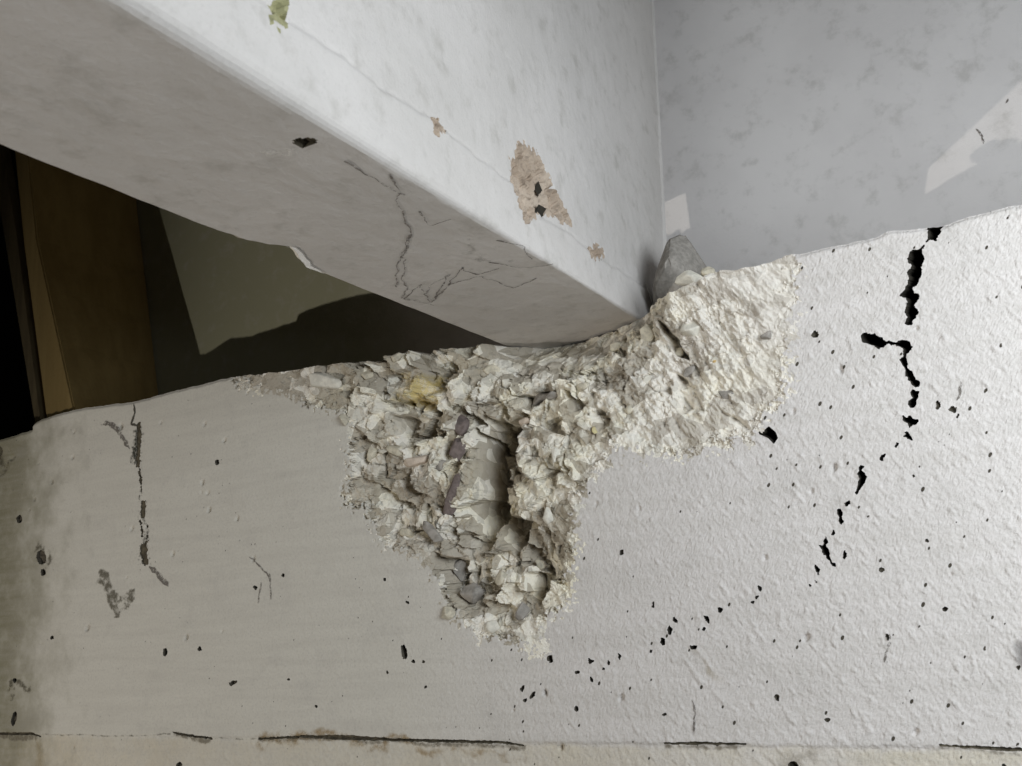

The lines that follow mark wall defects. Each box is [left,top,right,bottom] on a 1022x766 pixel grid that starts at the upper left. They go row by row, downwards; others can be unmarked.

spalling [290,246,324,273]
crack [344,161,552,305]
spalling [508,140,572,227]
crack [103,403,168,586]
spalling [232,254,813,665]
crack [809,227,942,587]
crack [588,653,621,682]
crack [650,607,723,653]